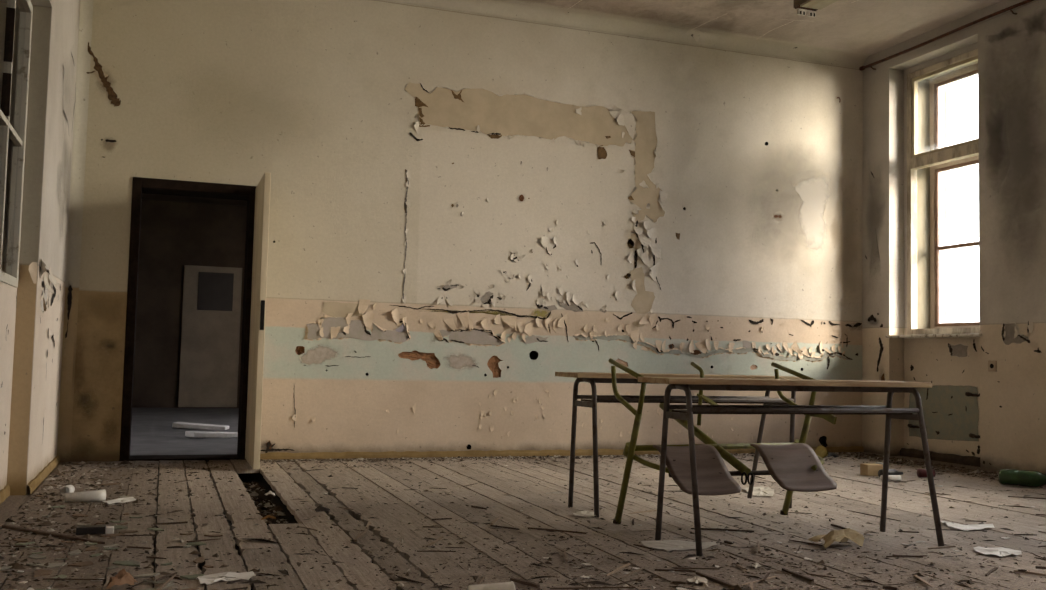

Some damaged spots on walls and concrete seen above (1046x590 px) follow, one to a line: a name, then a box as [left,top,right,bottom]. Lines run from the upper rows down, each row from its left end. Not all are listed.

peeling [295,82,853,432]
peeling [28,259,61,323]
peeling [948,340,977,358]
peeling [1001,322,1034,345]
peeling [907,385,980,456]